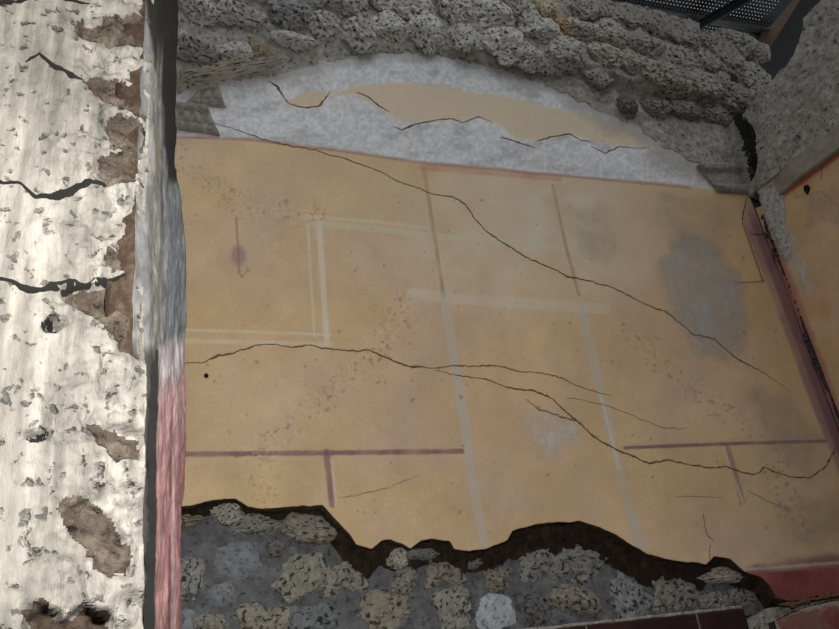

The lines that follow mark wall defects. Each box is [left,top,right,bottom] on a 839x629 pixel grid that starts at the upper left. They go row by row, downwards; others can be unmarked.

crack [0,0,27,8]
crack [64,0,90,8]
crack [25,52,86,84]
crack [356,92,649,154]
crack [0,178,106,201]
flaking render [757,180,791,262]
crack [0,273,126,298]
crack [185,107,839,506]
crack [143,349,159,629]
spalling [180,501,774,629]